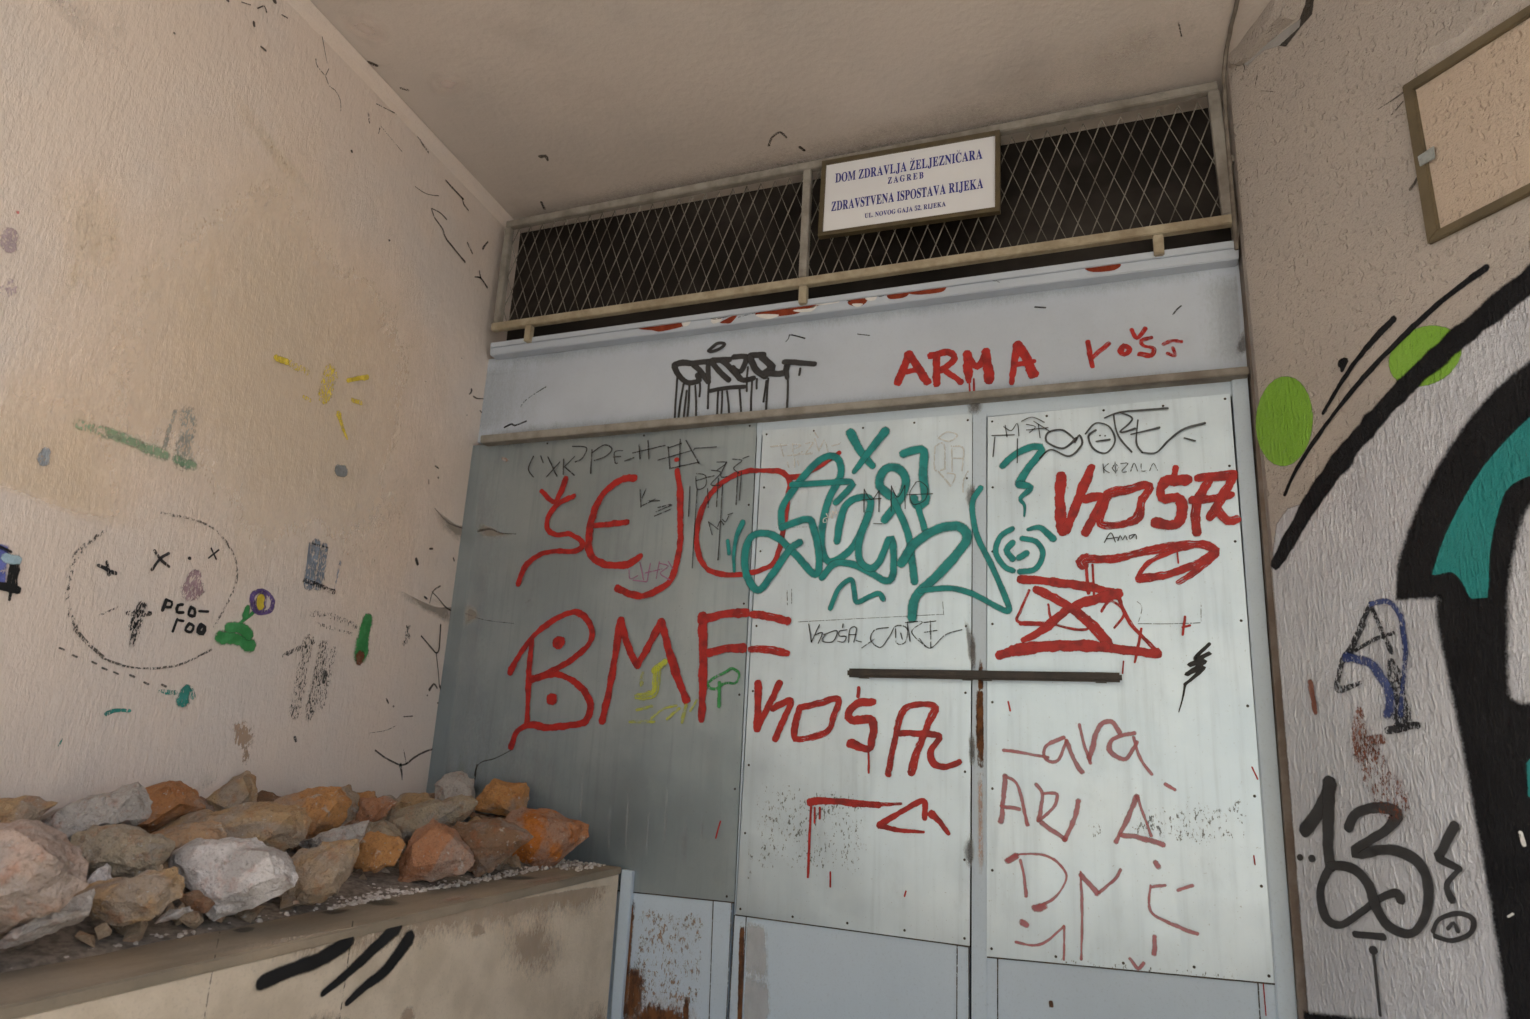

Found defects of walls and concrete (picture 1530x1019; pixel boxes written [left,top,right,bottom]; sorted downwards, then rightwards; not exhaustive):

rust [623,902,703,1019]
rust [737,927,745,1019]